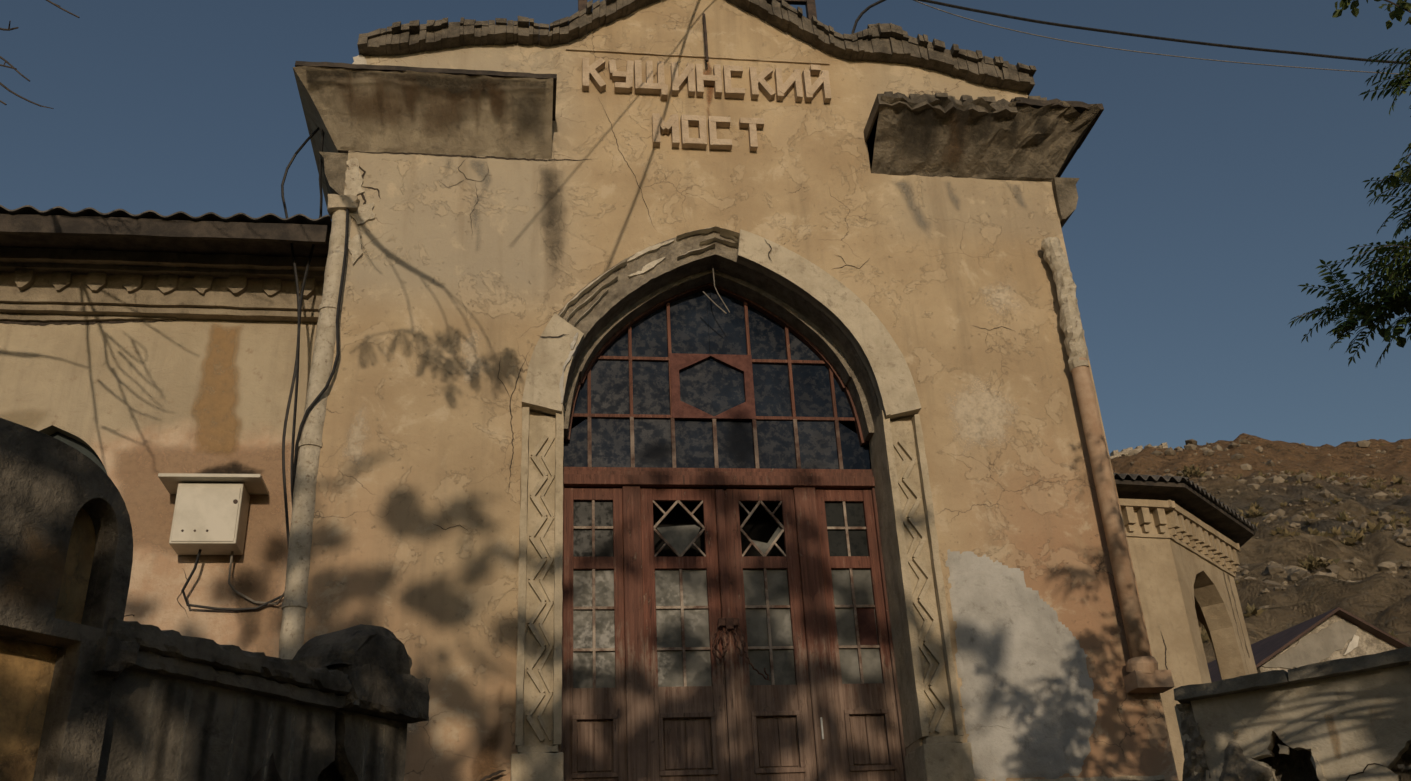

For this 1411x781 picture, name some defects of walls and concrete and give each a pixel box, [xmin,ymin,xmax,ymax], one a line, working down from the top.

spalling [1176,703,1211,781]
spalling [1311,754,1327,781]